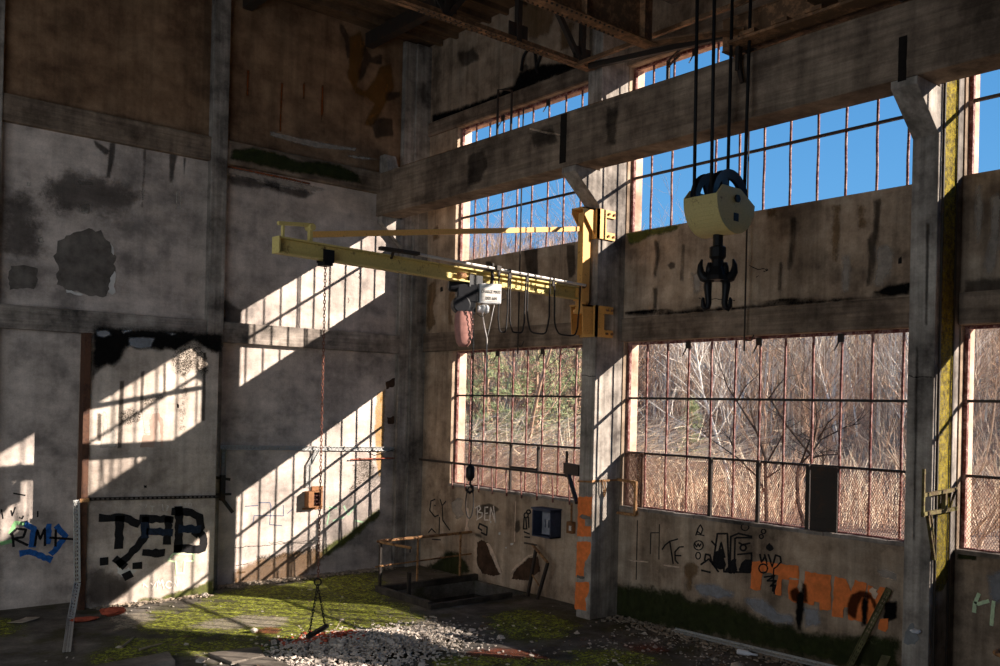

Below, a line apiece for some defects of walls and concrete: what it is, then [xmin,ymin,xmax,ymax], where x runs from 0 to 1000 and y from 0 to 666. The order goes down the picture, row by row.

leakage [47,142,144,210]
leakage [170,154,185,181]
spalling [54,228,116,297]
peeling [124,330,154,348]